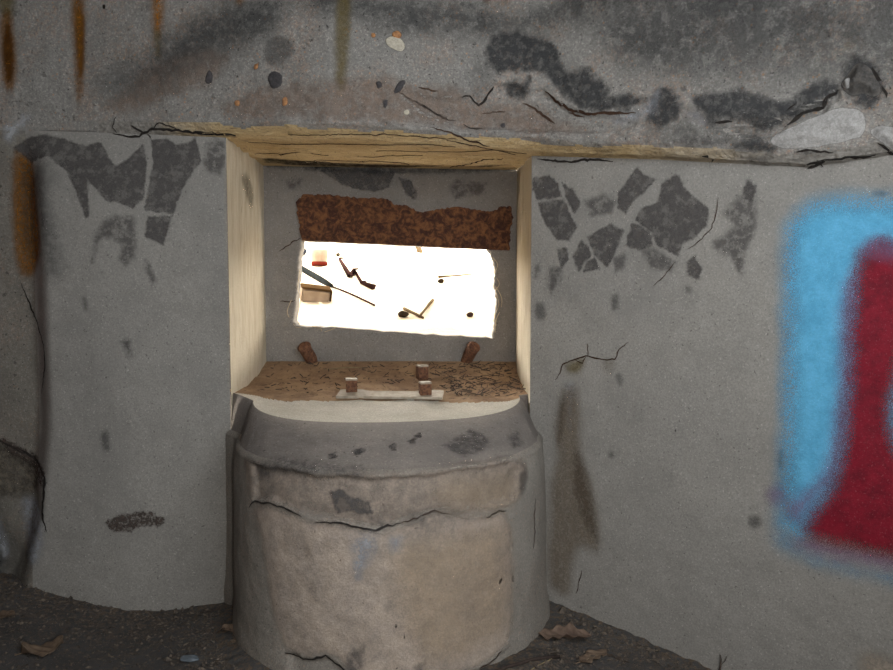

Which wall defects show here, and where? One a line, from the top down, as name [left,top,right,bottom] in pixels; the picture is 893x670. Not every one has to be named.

corrosion [1,0,15,89]
corrosion [73,0,84,88]
crack [872,67,888,98]
crack [112,86,613,168]
crack [523,91,636,124]
crack [785,90,838,127]
crack [797,143,893,169]
corrosion [14,155,39,274]
crack [21,283,45,393]
crack [555,342,628,380]
crack [249,500,451,531]
crack [286,653,345,670]